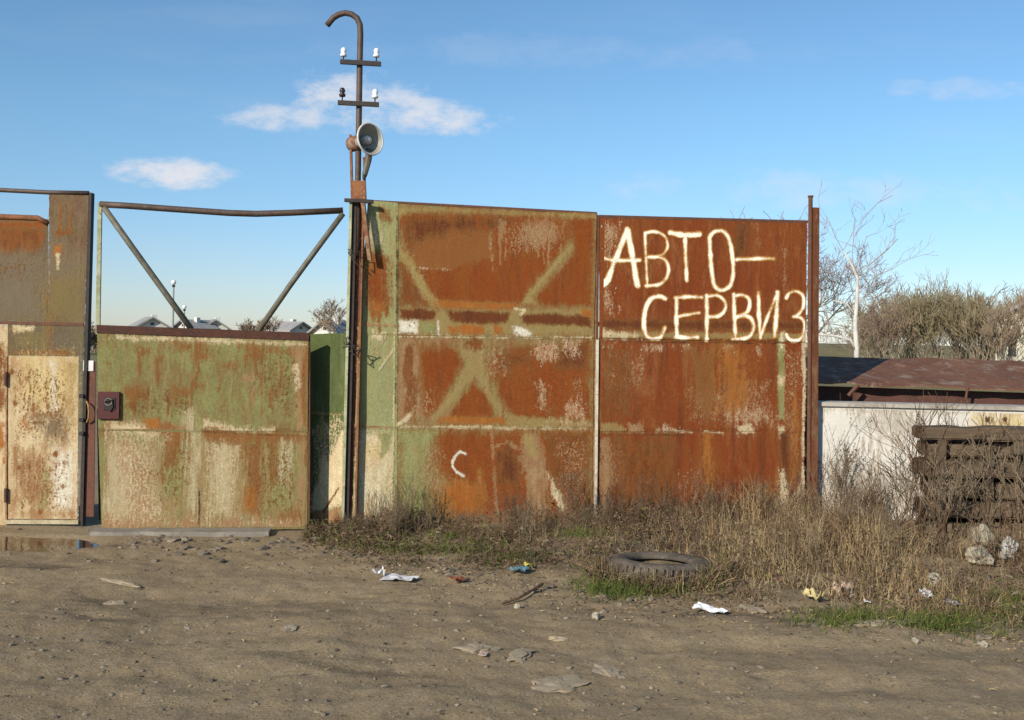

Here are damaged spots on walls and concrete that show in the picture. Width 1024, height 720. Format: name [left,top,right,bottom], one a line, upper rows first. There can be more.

corrosion [363,206,803,523]
peeling [568,212,620,261]